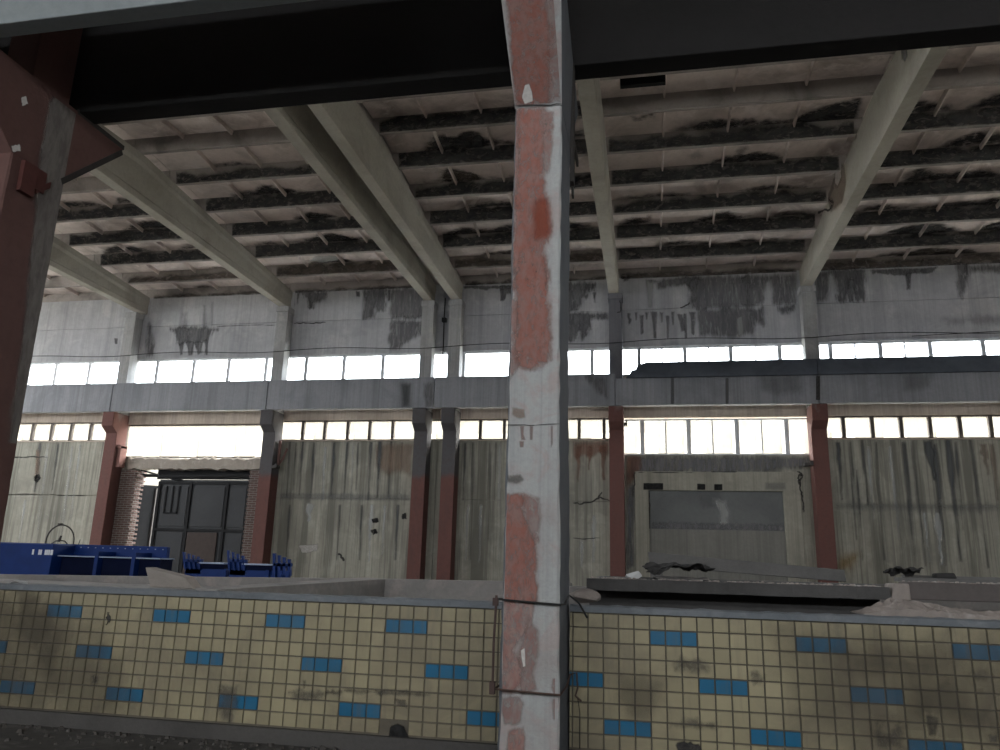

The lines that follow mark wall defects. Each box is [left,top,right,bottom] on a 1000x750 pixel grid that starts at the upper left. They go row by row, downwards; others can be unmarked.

damp [57,199,261,299]
damp [176,162,424,348]
peeling [506,0,560,375]
damp [609,98,861,338]
damp [815,94,1000,302]
damp [170,327,219,355]
crack [574,471,735,529]
damp [836,440,868,520]
damp [902,443,922,535]
damp [924,440,961,538]
peeling [502,493,540,750]